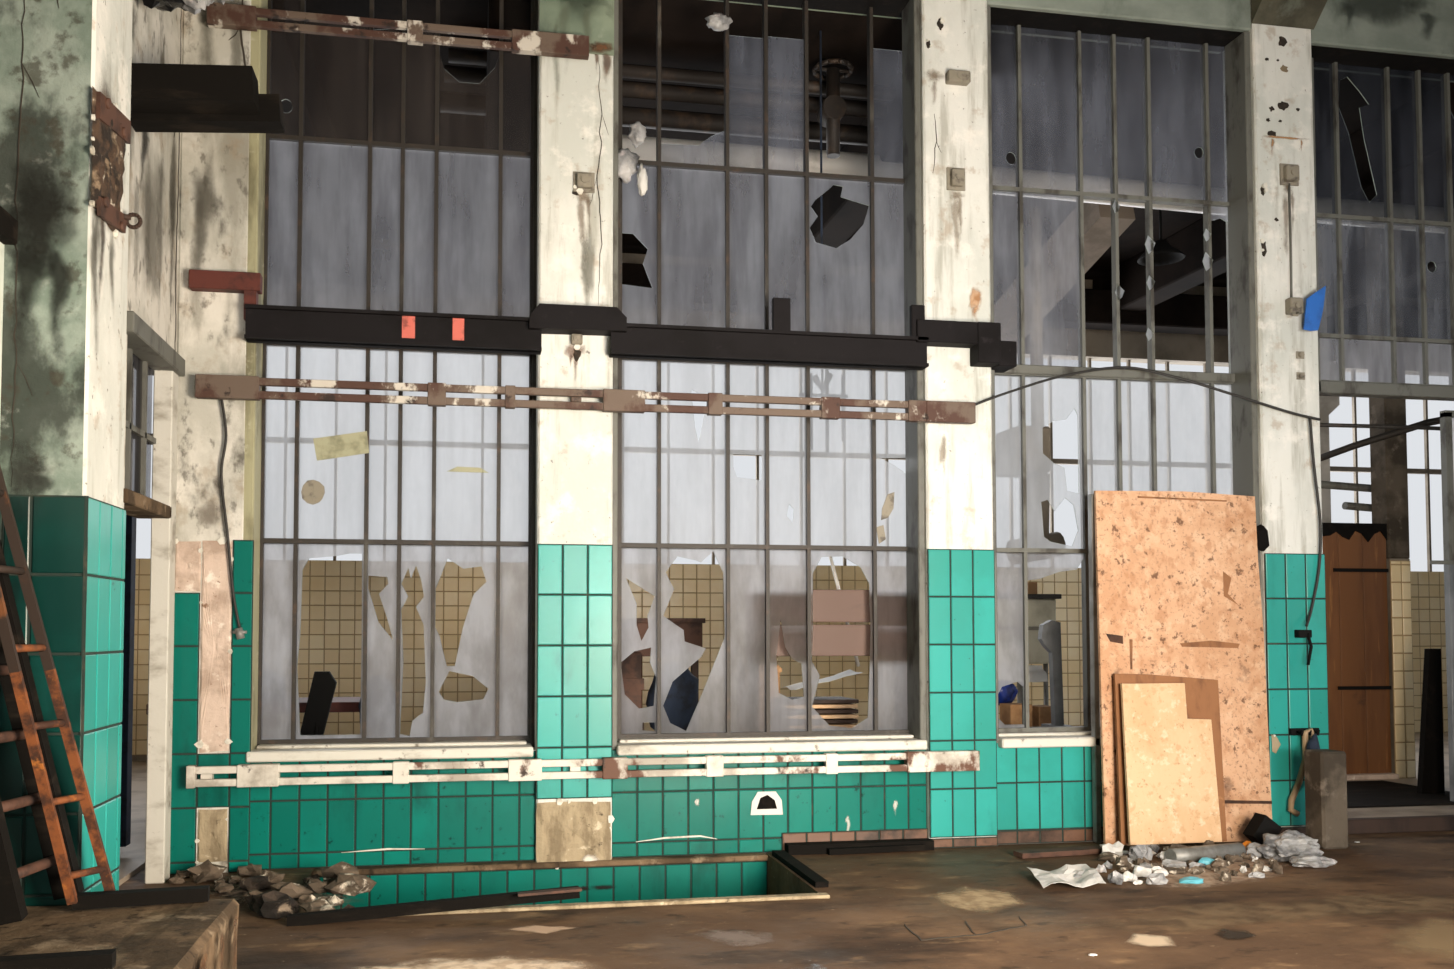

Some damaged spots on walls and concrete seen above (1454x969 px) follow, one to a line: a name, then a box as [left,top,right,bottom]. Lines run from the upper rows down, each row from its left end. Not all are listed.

spalling [1265,36,1288,72]
water stain [131,125,148,167]
spalling [1266,101,1300,136]
water stain [17,248,70,323]
water stain [92,208,113,297]
water stain [146,146,176,283]
water stain [194,176,215,267]
peeling [175,537,234,753]
peeling [536,798,614,869]